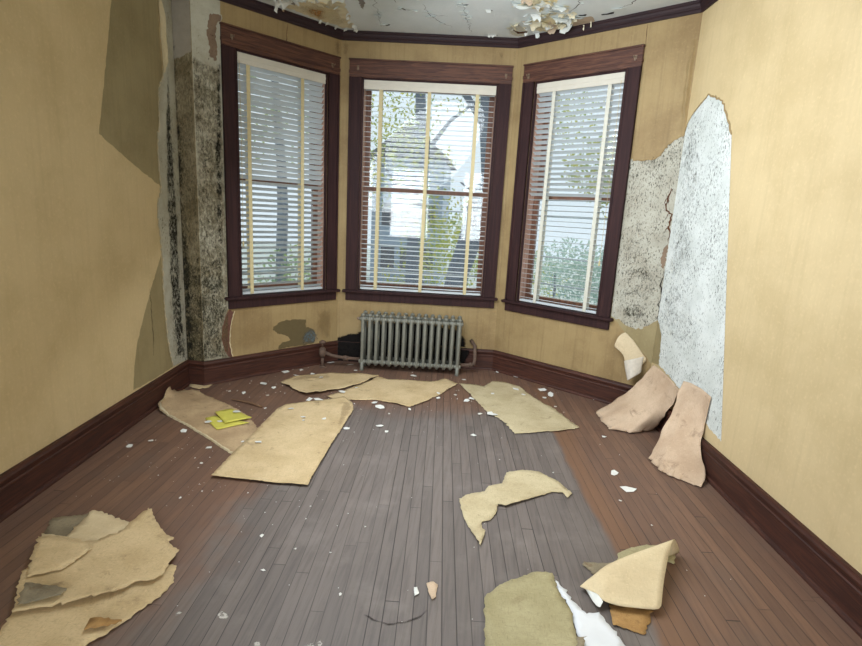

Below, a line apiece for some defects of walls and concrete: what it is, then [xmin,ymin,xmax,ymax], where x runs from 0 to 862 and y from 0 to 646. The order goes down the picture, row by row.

peeling [265,0,358,33]
peeling [509,0,614,38]
flaking render [157,0,235,367]
water stain [166,47,228,361]
crack [664,188,673,239]
flaking render [611,94,732,441]